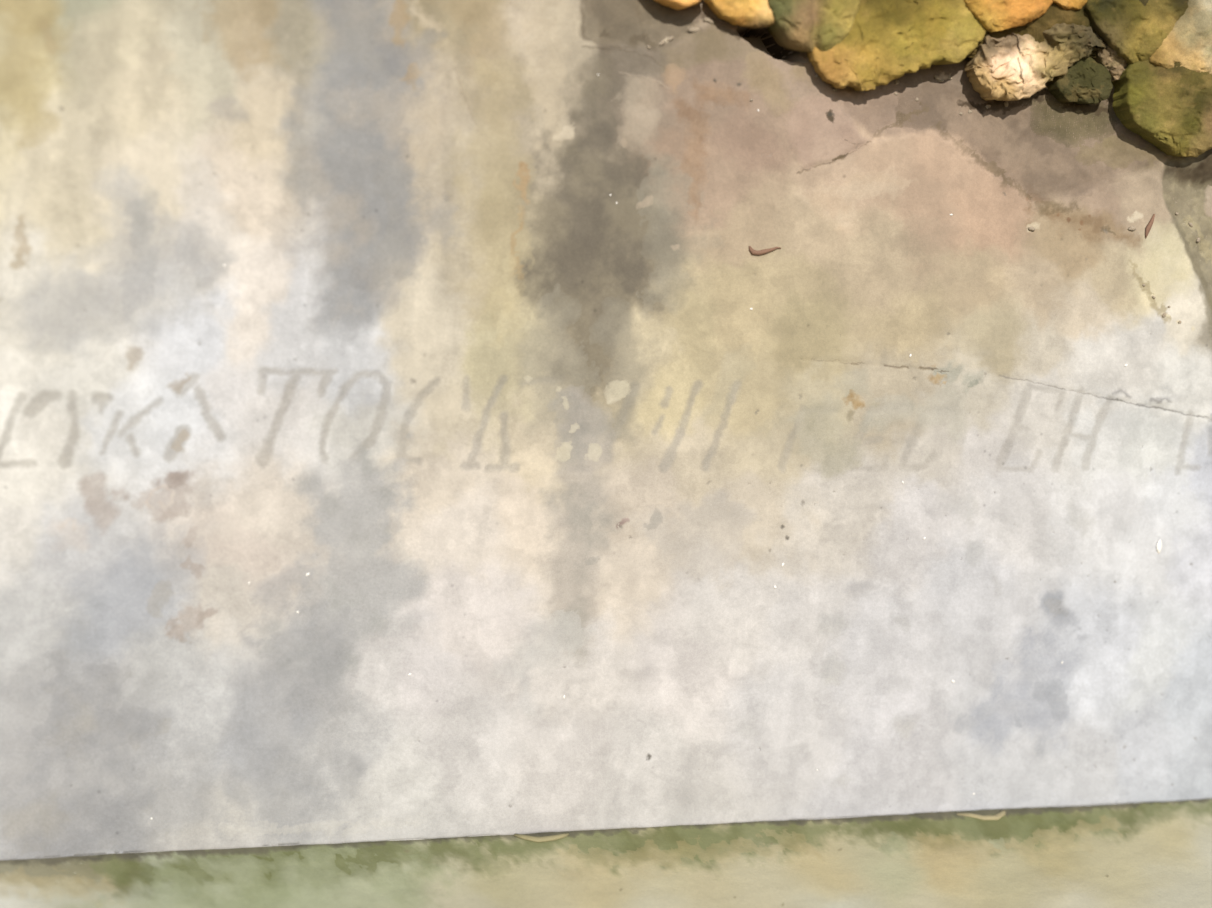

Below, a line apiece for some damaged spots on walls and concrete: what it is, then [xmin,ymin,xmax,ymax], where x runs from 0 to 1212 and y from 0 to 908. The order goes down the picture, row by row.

damp [0,0,76,151]
crack [796,139,871,175]
damp [3,159,241,363]
damp [292,0,763,721]
crack [800,357,949,375]
crack [998,373,1212,421]